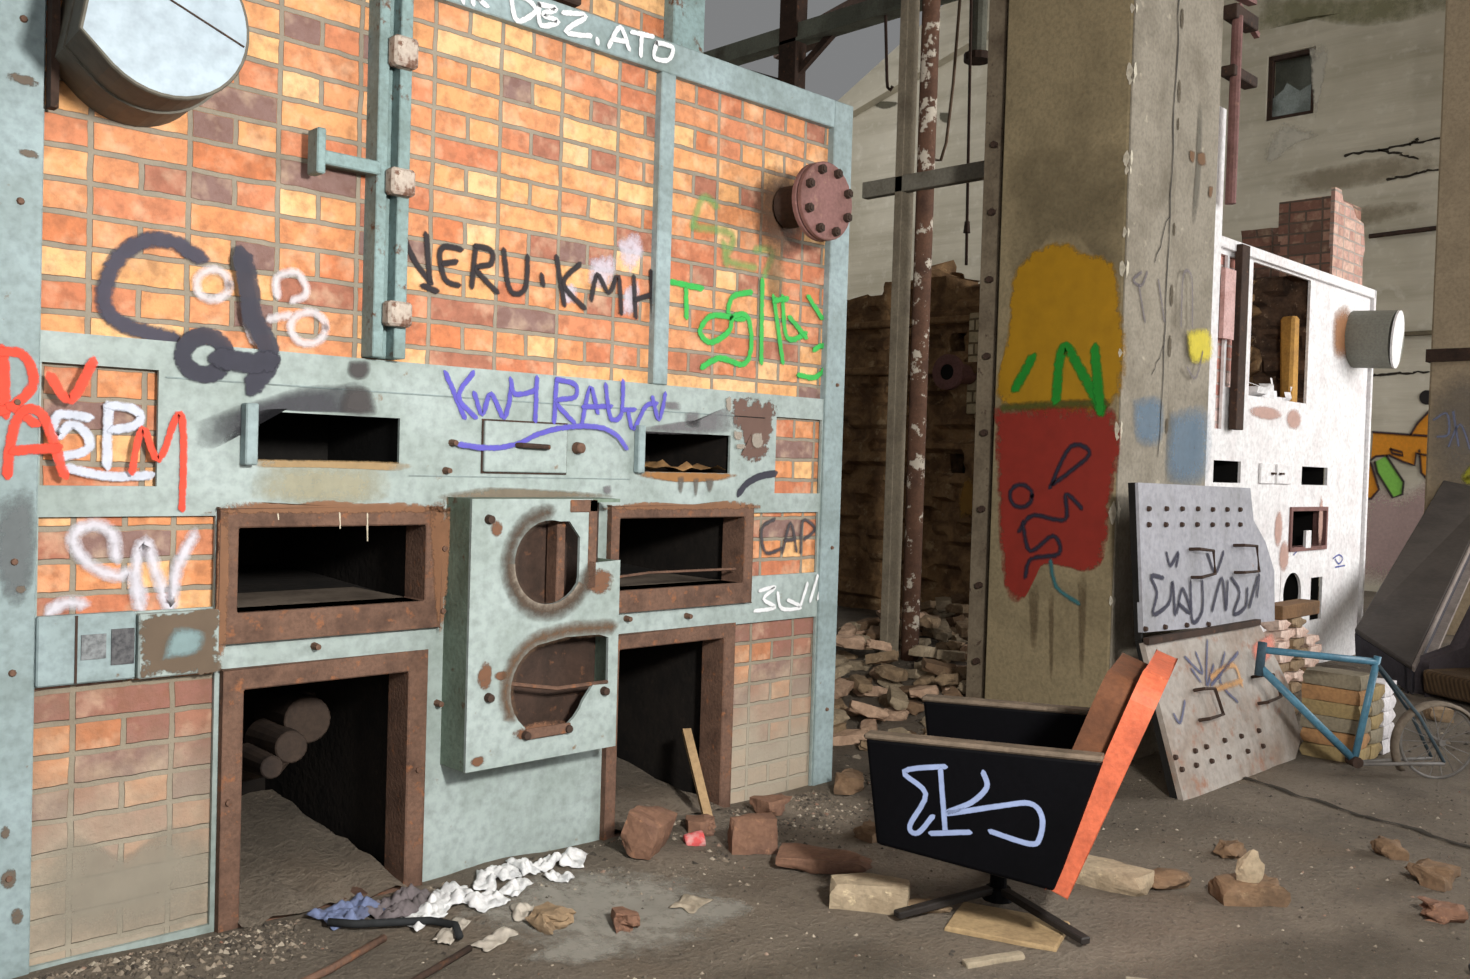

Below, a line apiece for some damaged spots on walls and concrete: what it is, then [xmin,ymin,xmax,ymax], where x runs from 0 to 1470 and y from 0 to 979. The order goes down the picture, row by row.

corrosion [874,101,898,109]
crack [1344,137,1440,181]
corrosion [139,460,761,678]
corrosion [478,662,505,689]